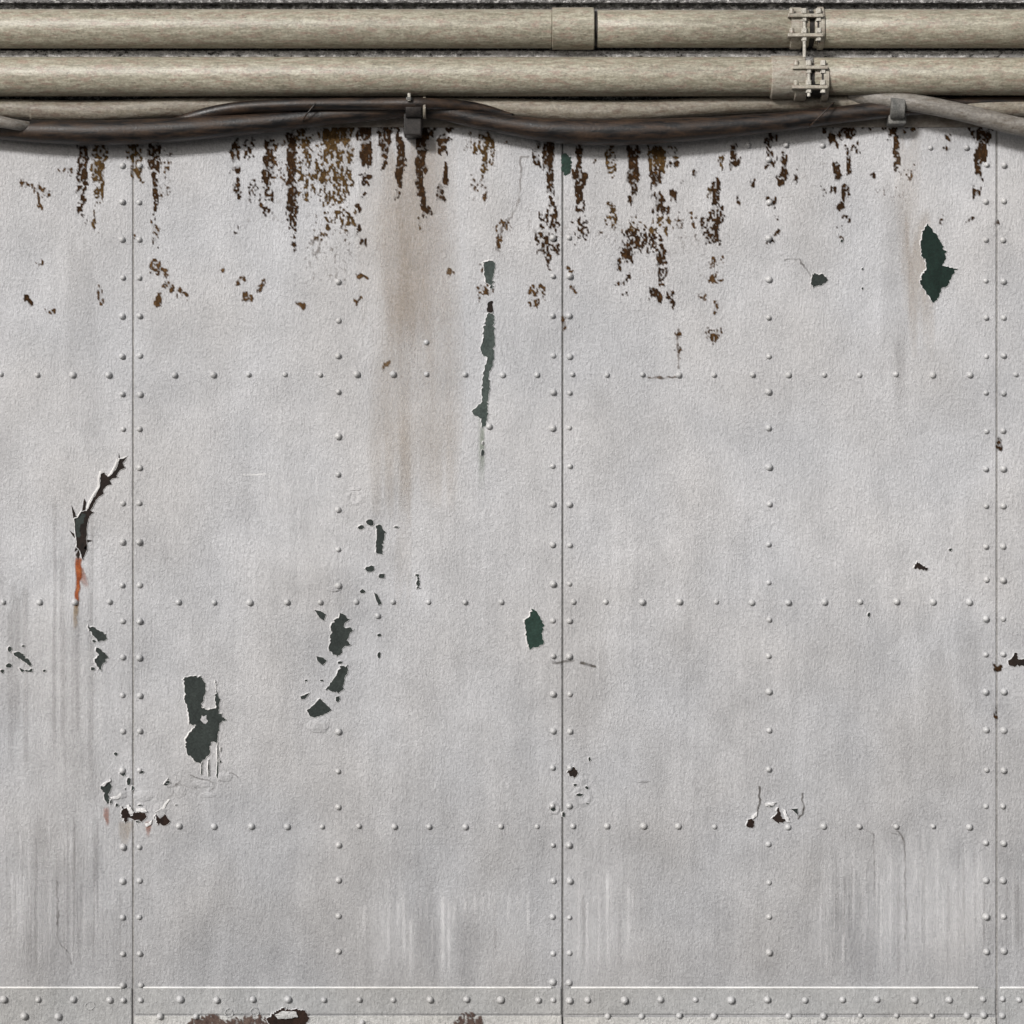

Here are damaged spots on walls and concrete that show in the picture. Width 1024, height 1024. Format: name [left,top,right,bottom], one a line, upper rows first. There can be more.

rust [57,144,108,229]
rust [126,143,188,307]
rust [229,127,454,251]
rust [532,140,741,315]
rust [822,127,915,223]
peeling [919,223,958,303]
rust [967,127,993,199]
peeling [471,259,496,428]
peeling [299,609,354,718]
peeling [523,608,545,650]
peeling [182,675,227,780]
peeling [100,770,177,827]